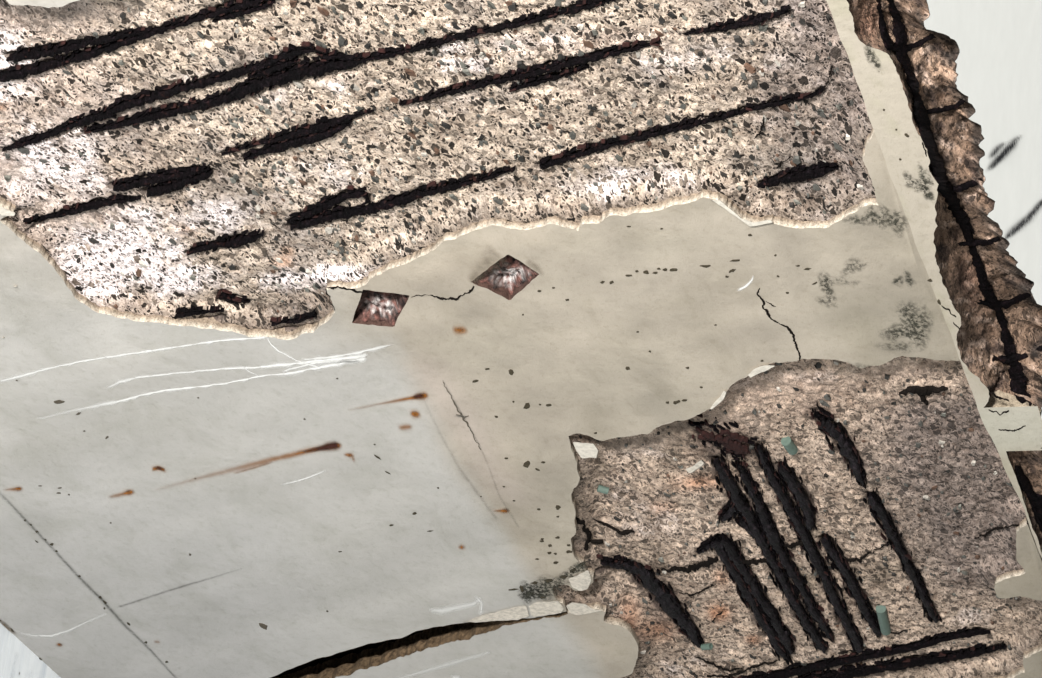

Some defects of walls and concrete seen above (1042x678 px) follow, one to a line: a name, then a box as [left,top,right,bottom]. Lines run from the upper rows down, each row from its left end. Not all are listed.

spalling [0,0,878,340]
water stain [0,337,389,410]
crack [326,286,362,310]
crack [411,286,474,301]
spalling [508,0,1042,678]
crack [757,288,801,361]
crack [989,392,1025,432]
corrosion [252,443,352,465]